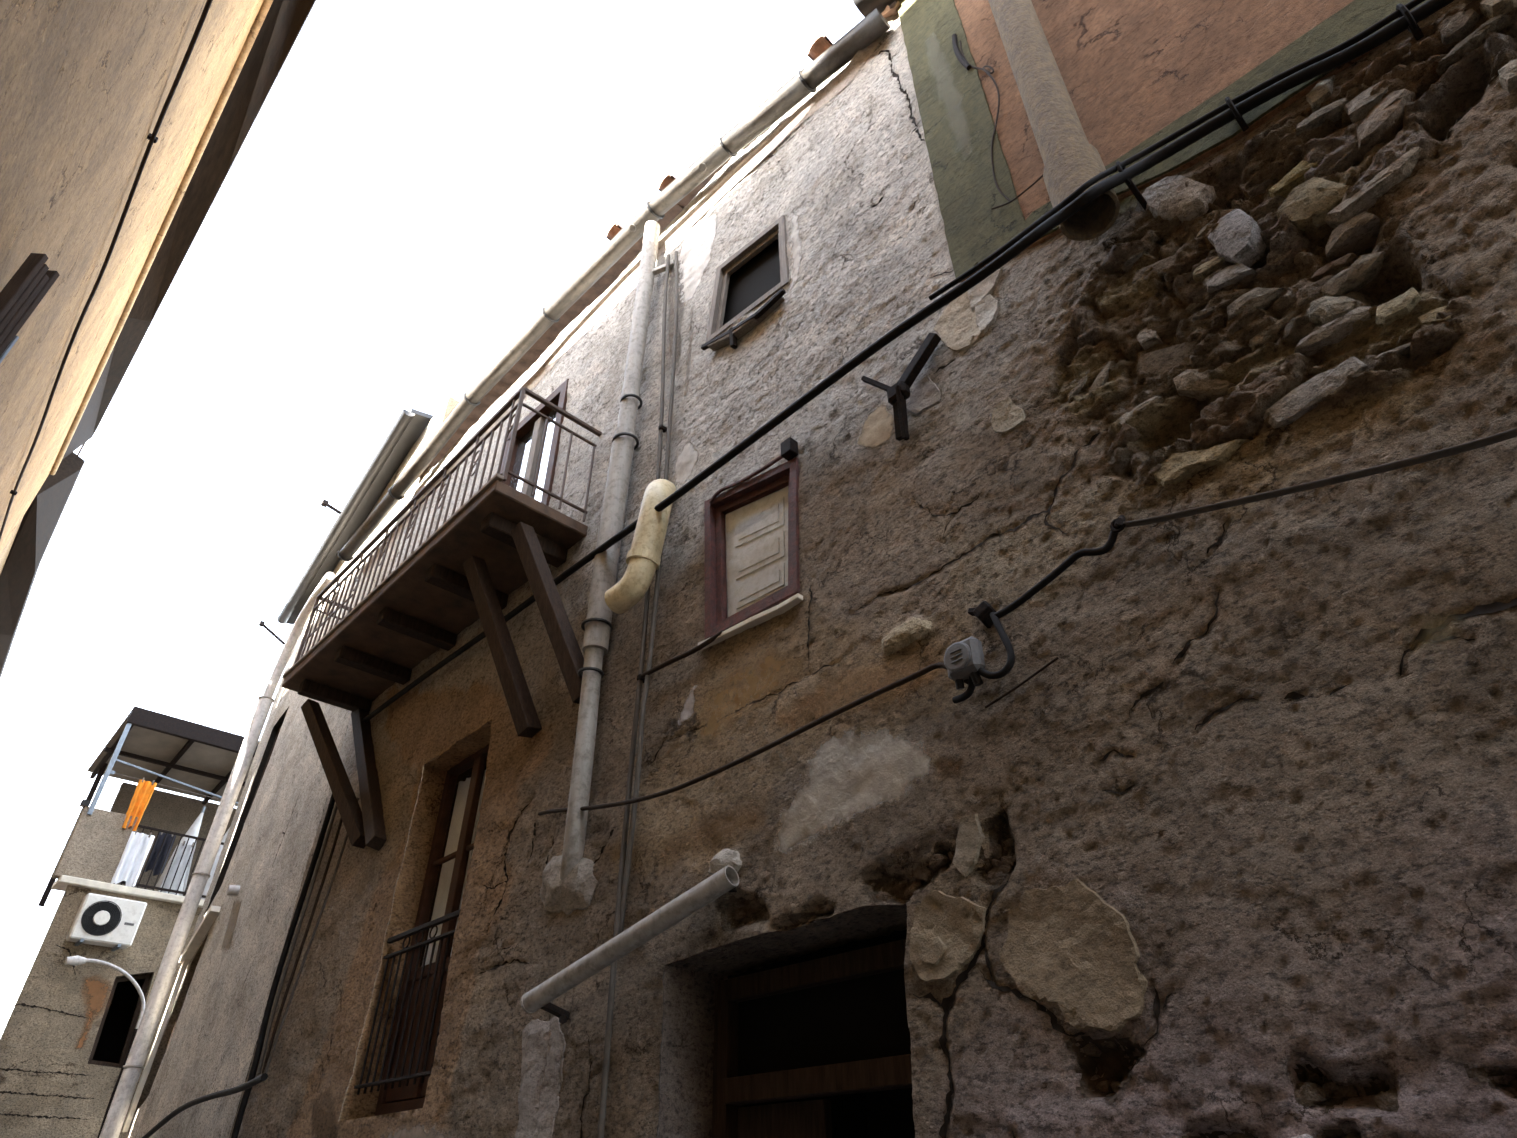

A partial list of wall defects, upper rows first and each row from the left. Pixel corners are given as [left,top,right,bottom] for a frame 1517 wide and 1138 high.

spalling [1051,0,1517,486]
crack [913,879,1085,1138]
crack [1143,985,1176,1050]